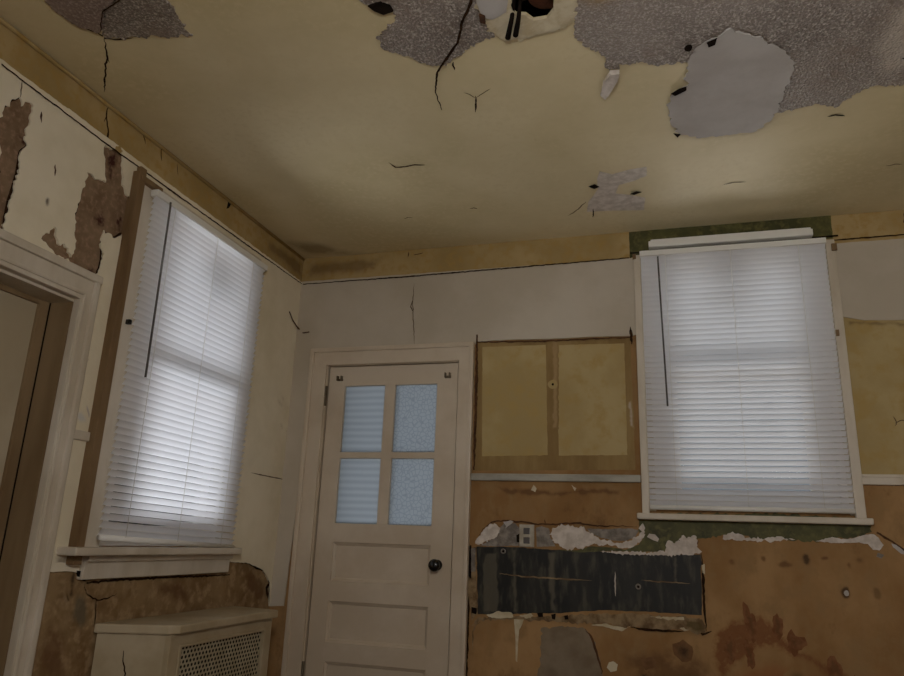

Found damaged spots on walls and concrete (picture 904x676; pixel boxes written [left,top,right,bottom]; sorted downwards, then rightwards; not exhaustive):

peeling [476,0,508,24]
crack [87,0,131,137]
crack [435,0,473,110]
crack [877,531,904,554]
spalling [237,562,270,604]
spalling [468,520,706,649]
leakage [610,617,716,676]